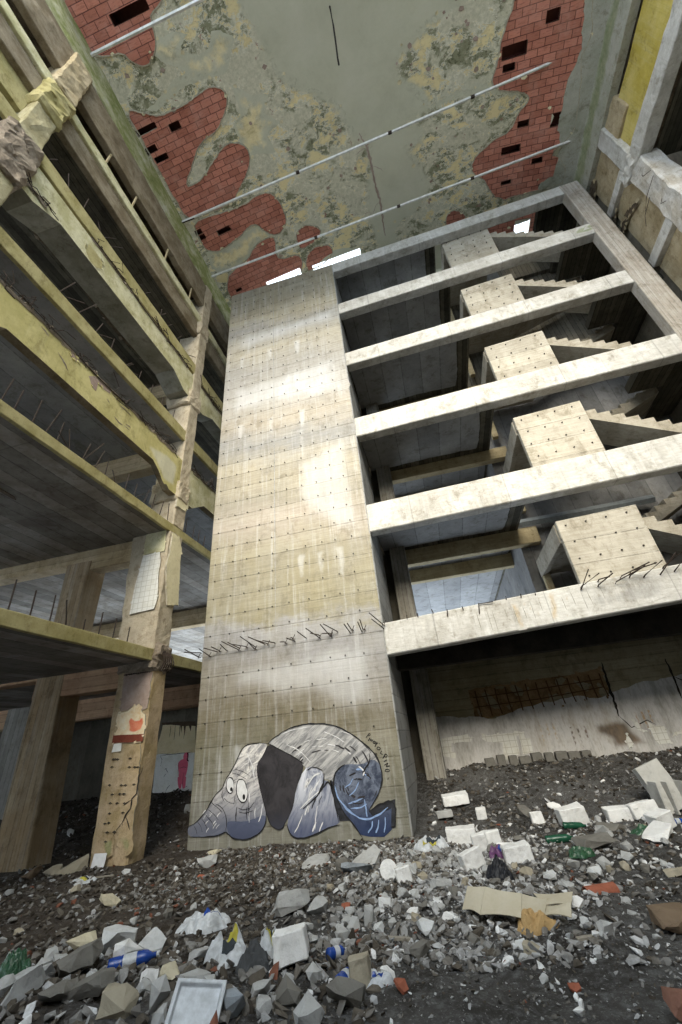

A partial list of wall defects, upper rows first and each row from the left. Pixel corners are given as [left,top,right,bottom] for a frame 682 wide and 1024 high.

peeling [64,0,611,310]
spalling [102,612,386,842]
spalling [468,666,609,719]
water stain [568,716,654,753]
crack [601,662,654,728]
crack [113,752,190,836]